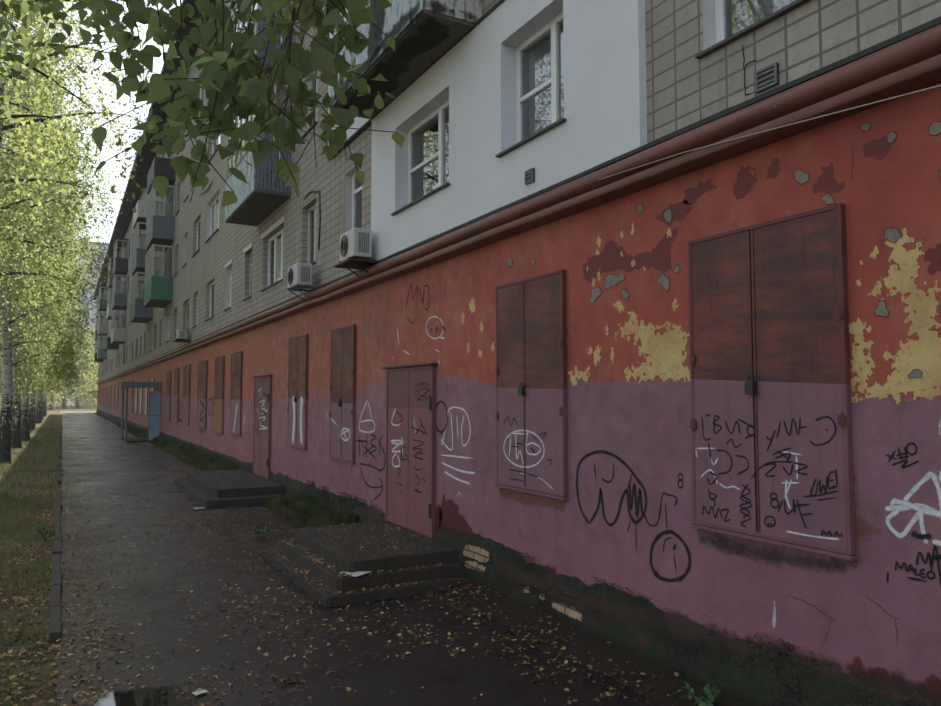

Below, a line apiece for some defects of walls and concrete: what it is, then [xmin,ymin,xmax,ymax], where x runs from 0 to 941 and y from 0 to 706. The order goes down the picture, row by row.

peeling [733,158,781,200]
peeling [793,162,845,205]
peeling [860,123,897,160]
peeling [568,178,716,386]
peeling [849,227,941,404]
leakage [495,558,941,706]